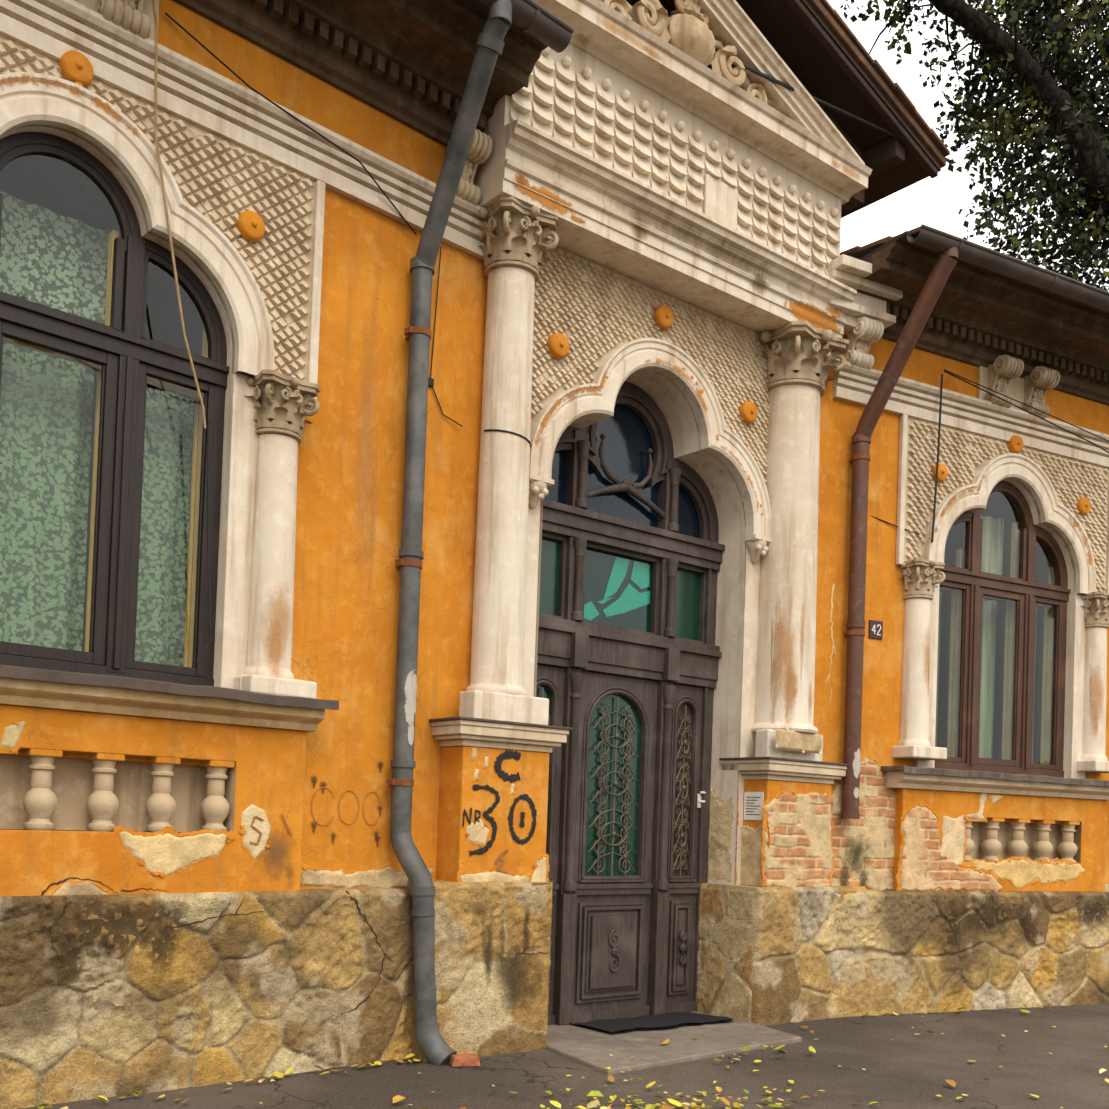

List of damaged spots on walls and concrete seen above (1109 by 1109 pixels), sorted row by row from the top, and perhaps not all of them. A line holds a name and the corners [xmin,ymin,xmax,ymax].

flaking render [114,804,272,880]
flaking render [464,819,491,848]
flaking render [707,757,1087,892]
crack [27,877,165,961]